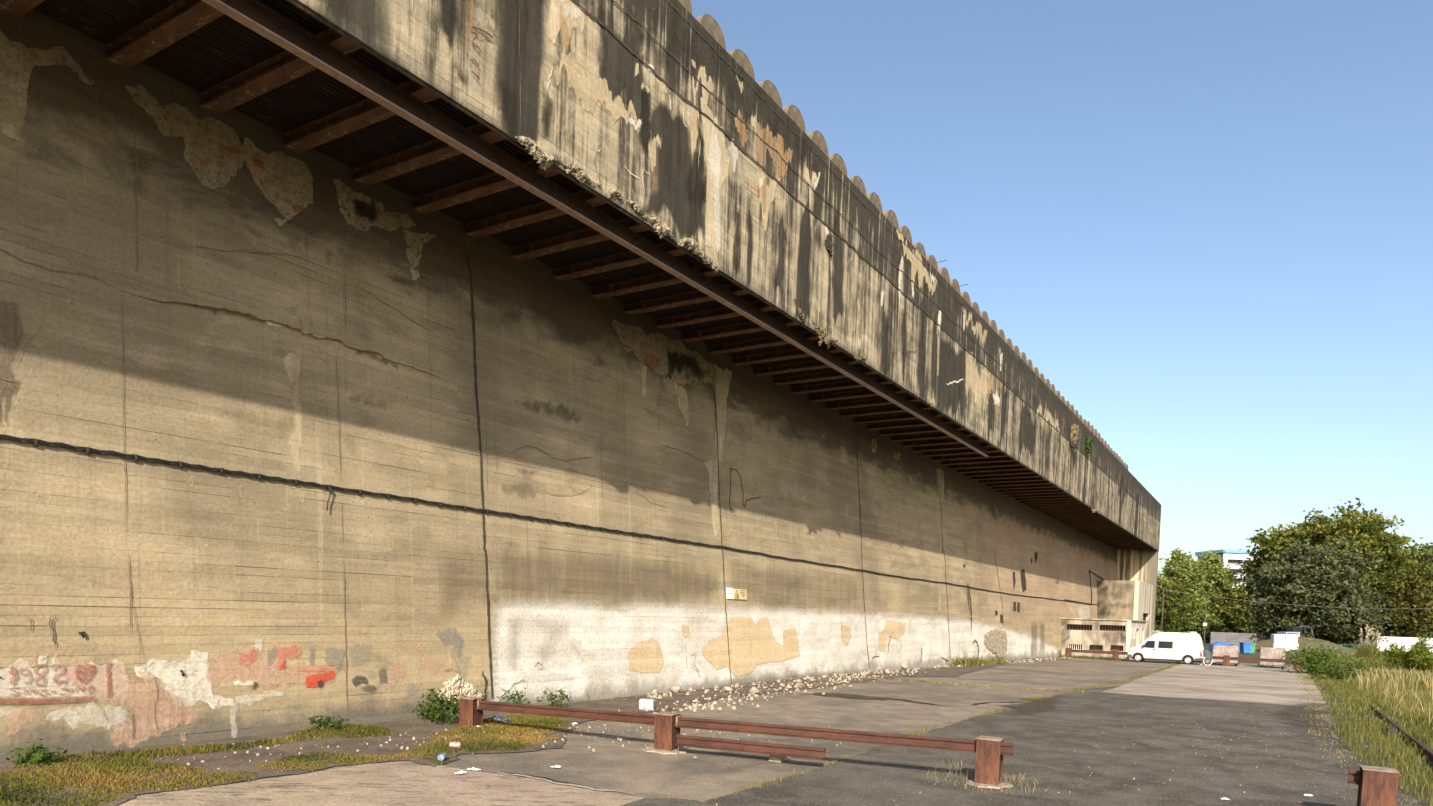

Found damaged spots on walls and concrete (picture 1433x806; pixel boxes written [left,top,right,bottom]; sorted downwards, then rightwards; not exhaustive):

water stain [440,0,456,47]
flaking render [0,29,95,145]
flaking render [124,84,314,227]
water stain [496,0,860,325]
flaking render [333,179,437,280]
water stain [0,302,22,420]
water stain [858,230,1076,469]